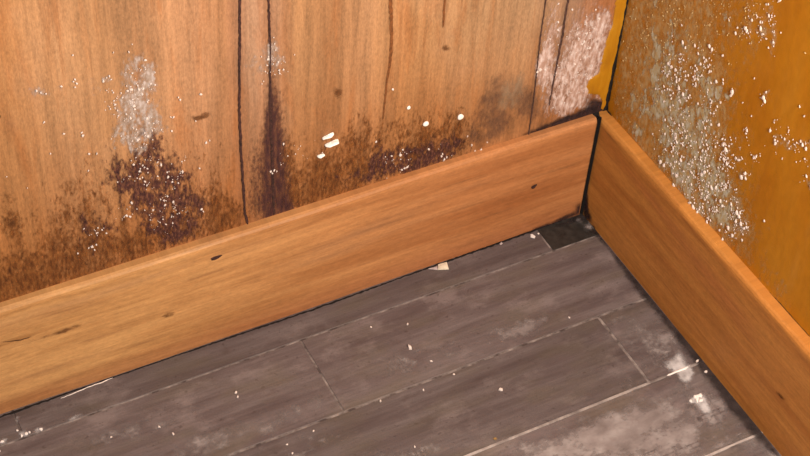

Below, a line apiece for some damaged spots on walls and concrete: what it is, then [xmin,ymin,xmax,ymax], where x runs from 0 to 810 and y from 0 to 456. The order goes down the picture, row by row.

leakage [0,44,243,302]
crack [238,0,248,224]
crack [267,0,275,215]
leakage [251,78,521,218]
crack [383,0,393,119]
crack [528,0,569,135]
leakage [530,9,613,134]
crack [580,0,629,214]
crack [0,221,561,418]